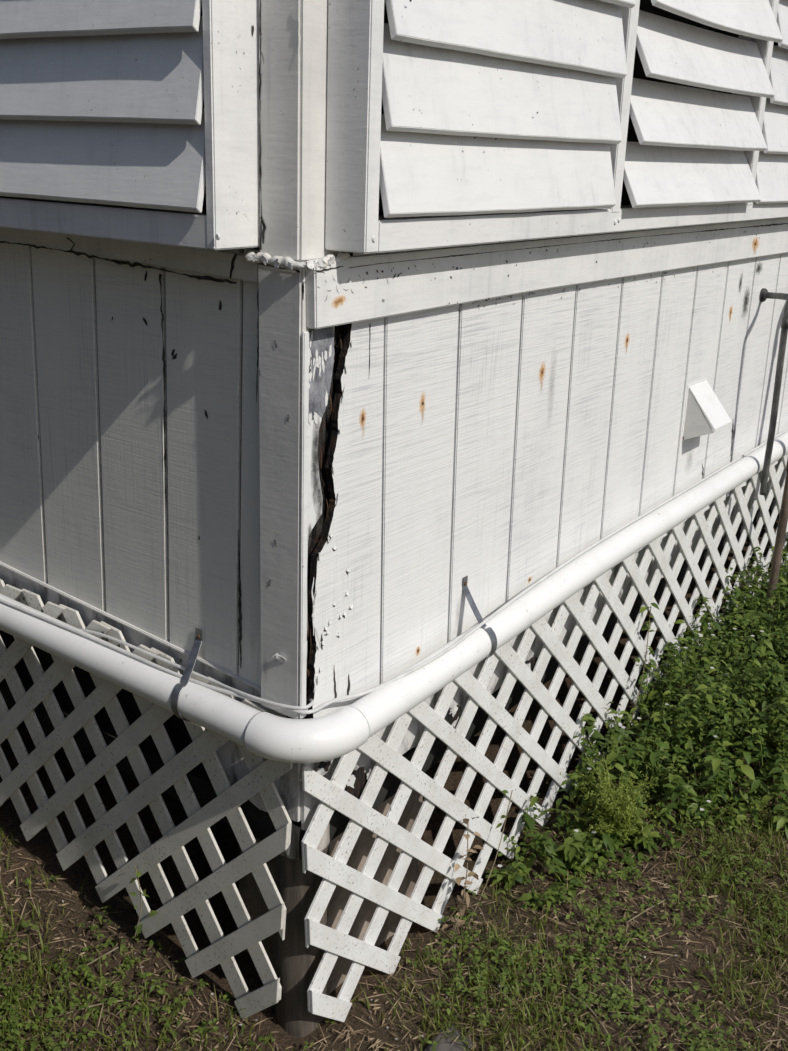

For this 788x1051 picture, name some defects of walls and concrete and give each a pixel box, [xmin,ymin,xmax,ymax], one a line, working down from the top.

crack [257,0,265,100]
crack [0,126,266,402]
peeling [308,326,347,425]
crack [334,670,350,698]